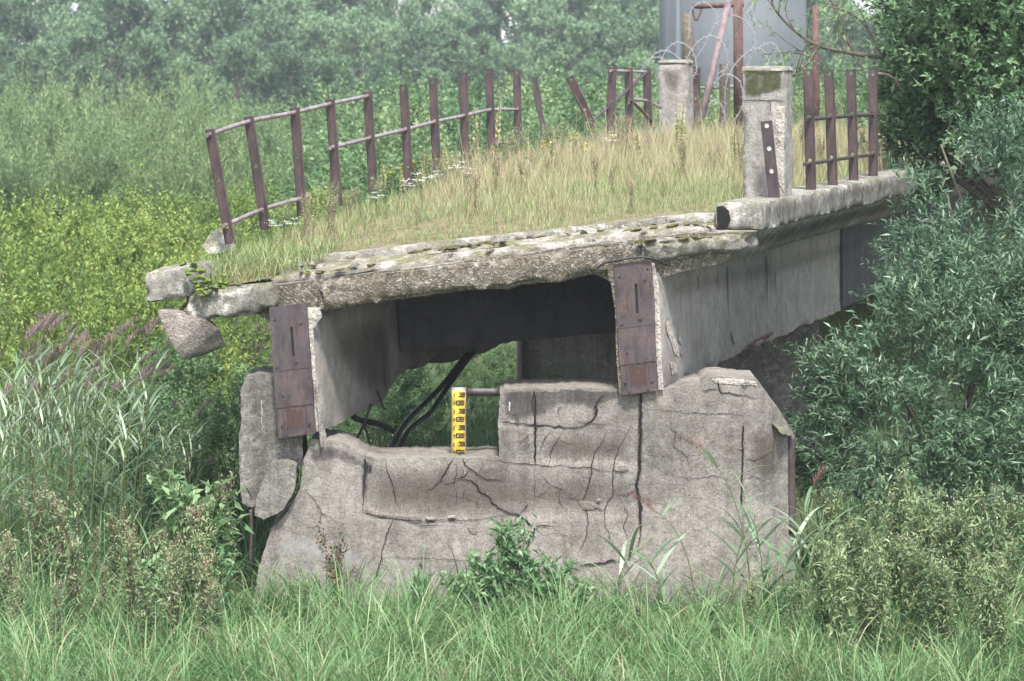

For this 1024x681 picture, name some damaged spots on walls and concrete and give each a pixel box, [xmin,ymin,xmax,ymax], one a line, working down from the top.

spalling [186,283,280,320]
crack [362,381,775,584]